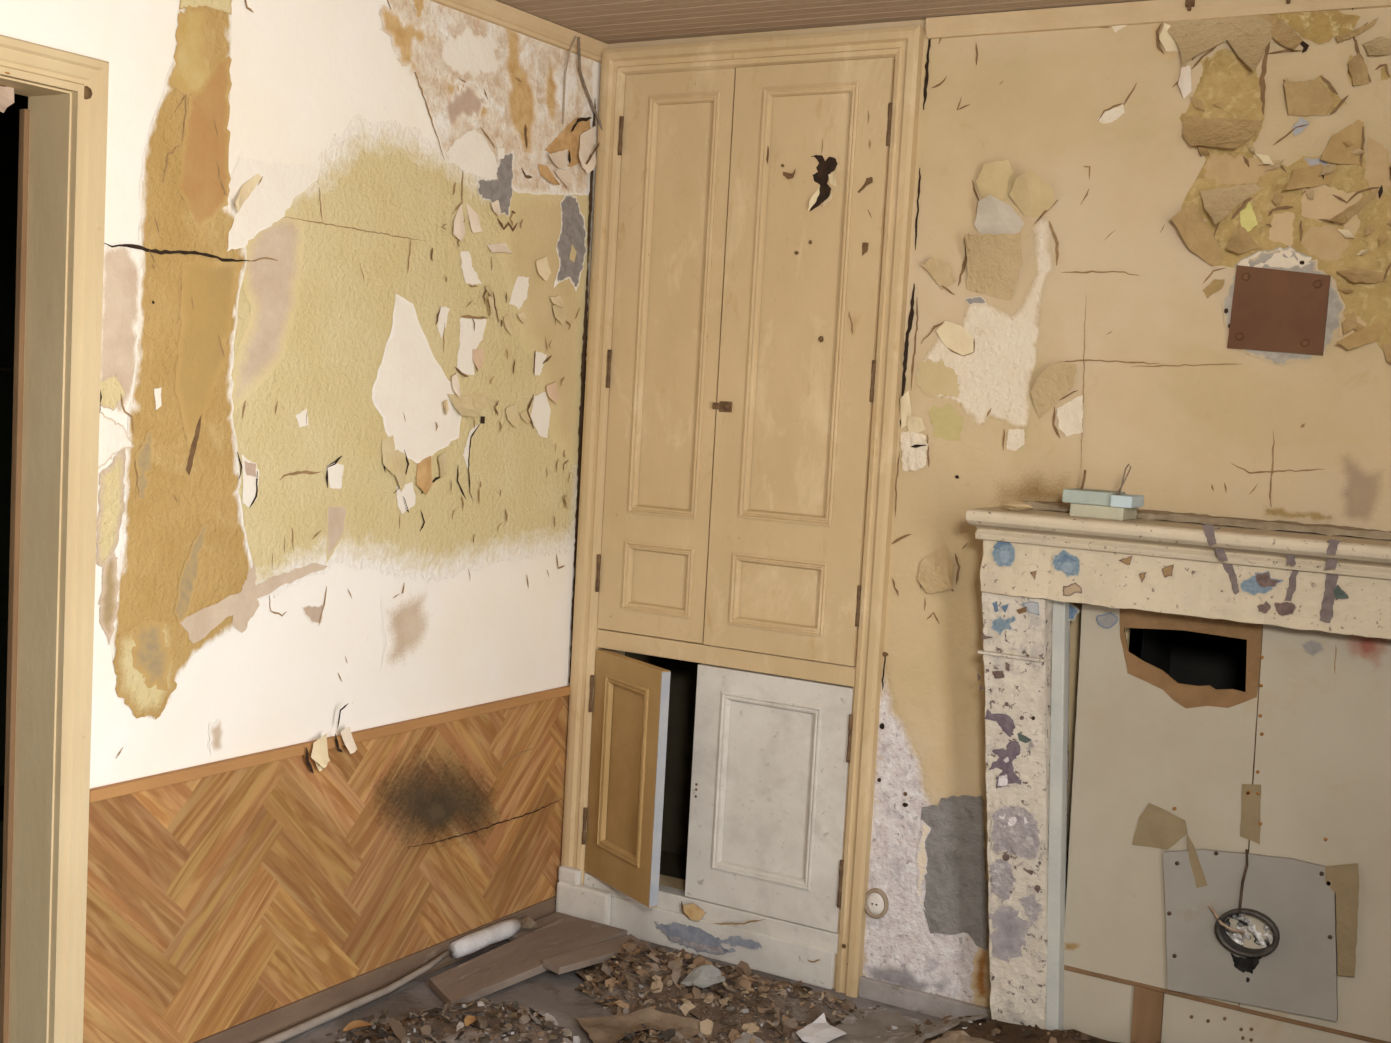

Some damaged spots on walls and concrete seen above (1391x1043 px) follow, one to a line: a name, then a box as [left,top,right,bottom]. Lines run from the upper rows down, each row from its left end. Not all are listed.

peeling [766,147,795,179]
peeling [808,138,838,211]
crack [104,243,278,262]
peeling [180,0,595,673]
flaking render [900,160,1083,472]
peeling [154,388,162,410]
peeling [96,242,140,644]
peeling [977,601,1040,690]
peeling [207,718,225,754]
water stain [385,768,485,831]
peeling [842,652,1043,1005]
peeling [655,901,767,955]